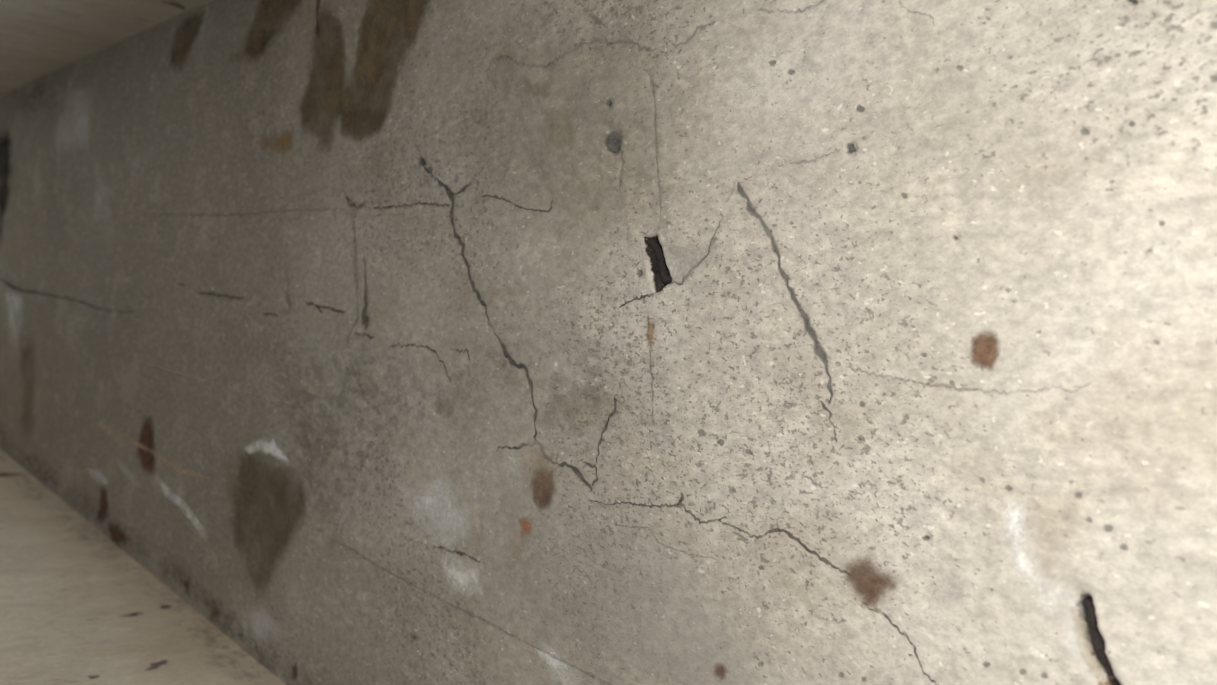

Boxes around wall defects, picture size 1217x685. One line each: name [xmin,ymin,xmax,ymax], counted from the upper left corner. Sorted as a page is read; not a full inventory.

water stain [246,0,300,58]
water stain [301,0,426,135]
water stain [0,133,10,215]
spalling [638,236,715,293]
crack [373,167,553,449]
crack [738,182,837,443]
rust [972,333,997,368]
rust [138,420,154,469]
rust [532,468,554,508]
crack [559,396,851,575]
rust [850,563,888,602]
crack [863,602,939,685]